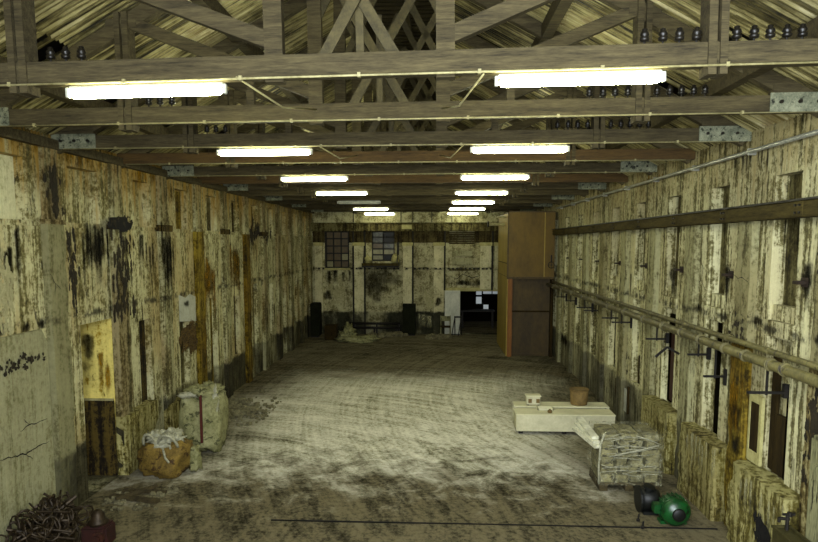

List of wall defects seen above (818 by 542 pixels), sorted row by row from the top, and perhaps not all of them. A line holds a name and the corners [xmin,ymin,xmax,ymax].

water stain [82,223,109,276]
spalling [0,351,46,377]
crack [0,442,48,461]